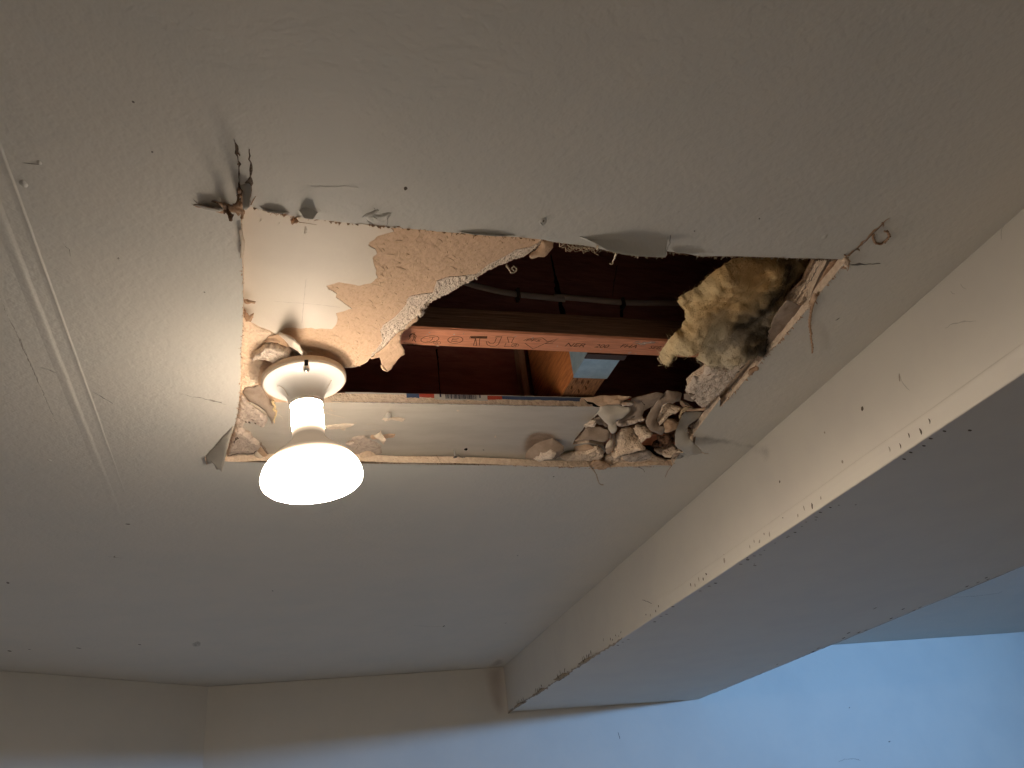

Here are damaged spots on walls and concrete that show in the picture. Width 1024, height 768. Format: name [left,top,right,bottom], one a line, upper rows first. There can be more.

crack [193,140,256,221]
peeling [243,208,541,368]
crack [799,218,891,296]
peeling [239,360,288,424]
flaking render [684,363,745,408]
peeling [204,426,239,472]